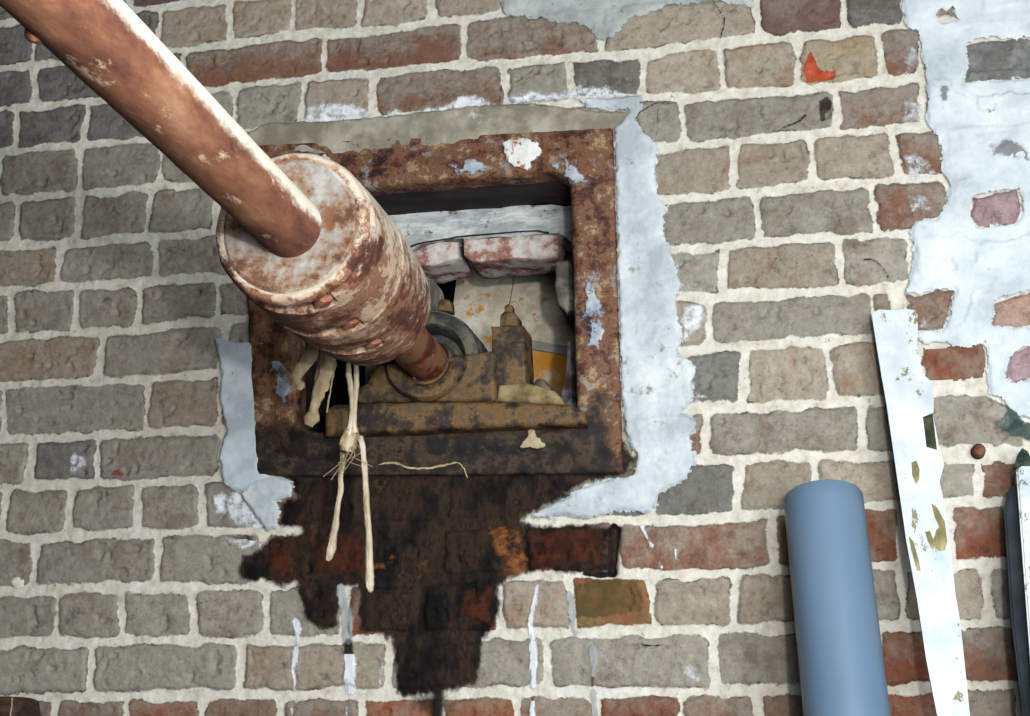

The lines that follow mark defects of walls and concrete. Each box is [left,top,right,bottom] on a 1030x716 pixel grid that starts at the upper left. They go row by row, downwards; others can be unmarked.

peeling [901,0,1030,418]
rust [492,528,526,574]
damp [418,685,444,716]